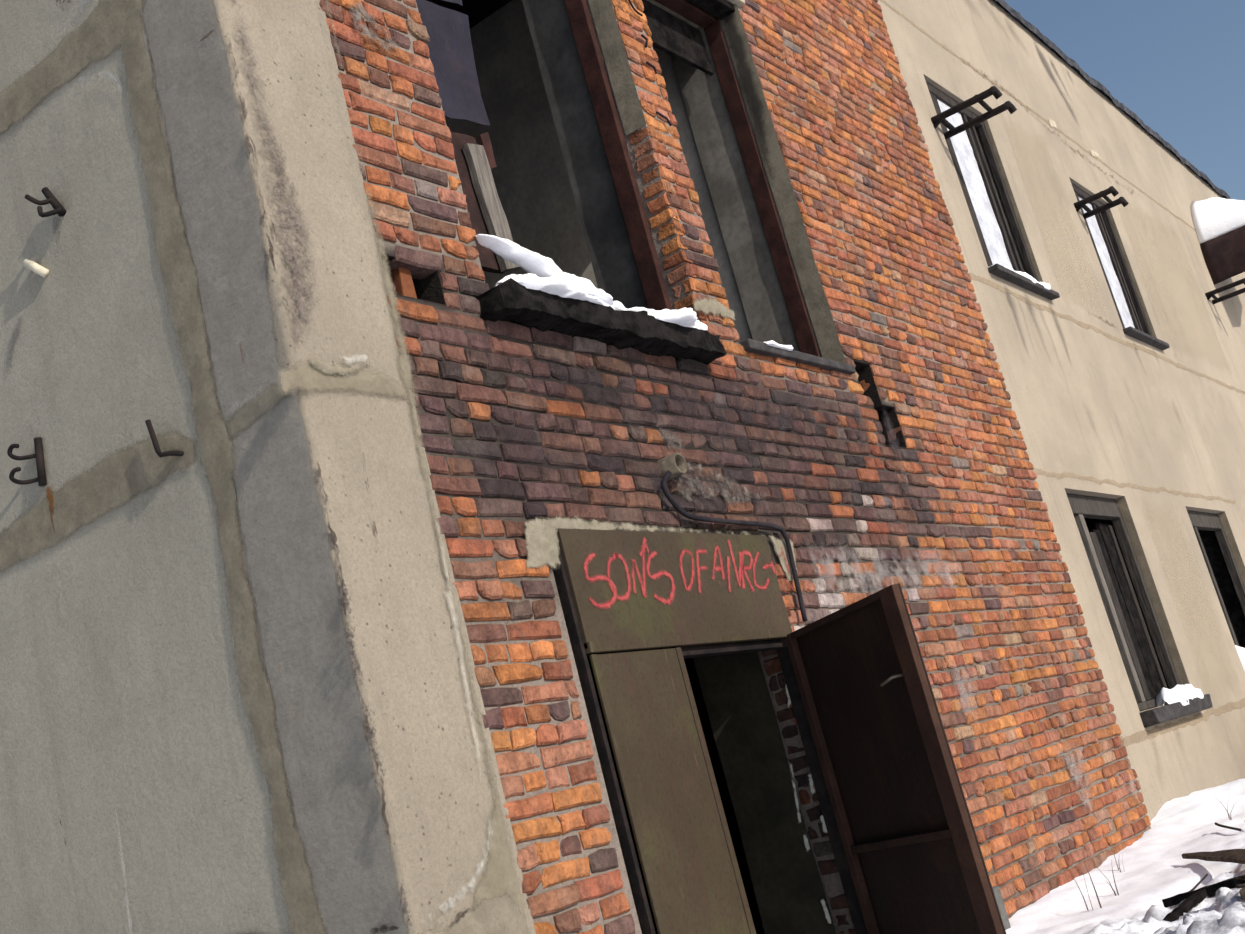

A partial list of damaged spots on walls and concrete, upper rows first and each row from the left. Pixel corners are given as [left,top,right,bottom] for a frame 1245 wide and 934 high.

corrosion [46,487,54,528]
crack [317,462,347,627]
crack [354,667,390,839]
crack [371,925,398,934]